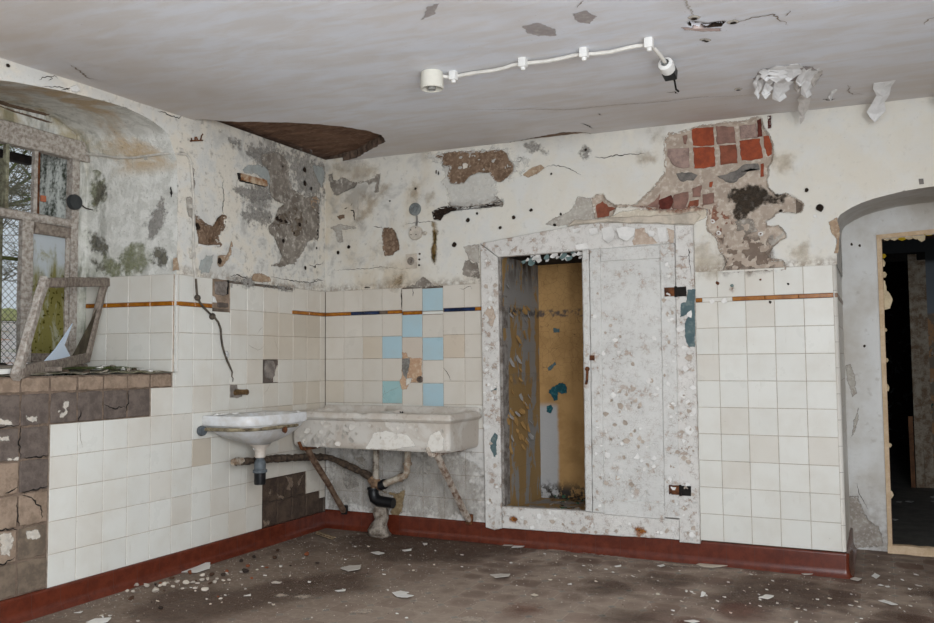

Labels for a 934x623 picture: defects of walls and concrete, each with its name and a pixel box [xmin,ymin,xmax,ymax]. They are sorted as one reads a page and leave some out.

peeling [753,64,823,124]
peeling [867,80,896,122]
spalling [296,127,385,161]
spalling [186,168,233,267]
spalling [252,151,320,283]
spalling [331,215,356,255]
spalling [382,227,400,256]
spalling [428,148,552,222]
spalling [521,117,809,273]
spalling [829,218,840,253]
peeling [212,279,229,309]
peeling [262,471,323,528]